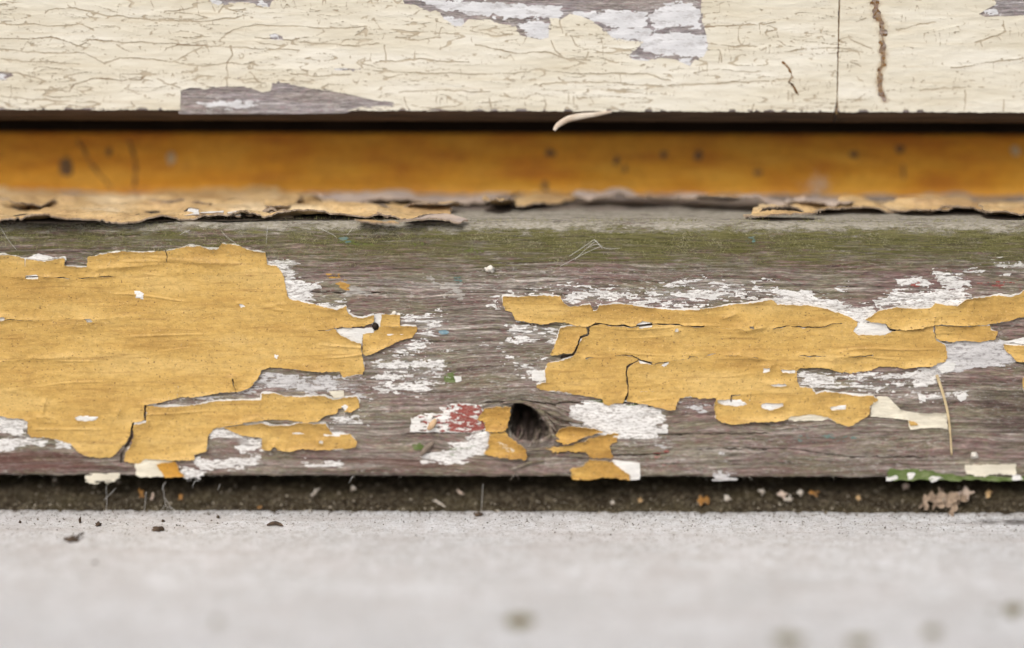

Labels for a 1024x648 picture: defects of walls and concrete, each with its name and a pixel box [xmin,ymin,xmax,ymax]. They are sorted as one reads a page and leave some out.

crack [13,36,104,44]
crack [71,76,146,89]
crack [153,43,232,63]
peeling [179,81,395,114]
peeling [403,0,709,66]
crack [782,61,798,94]
crack [833,0,841,115]
peeling [0,181,1024,225]
peeling [0,242,418,500]
peeling [502,290,1024,430]
peeling [410,403,641,480]
peeling [886,464,1024,498]